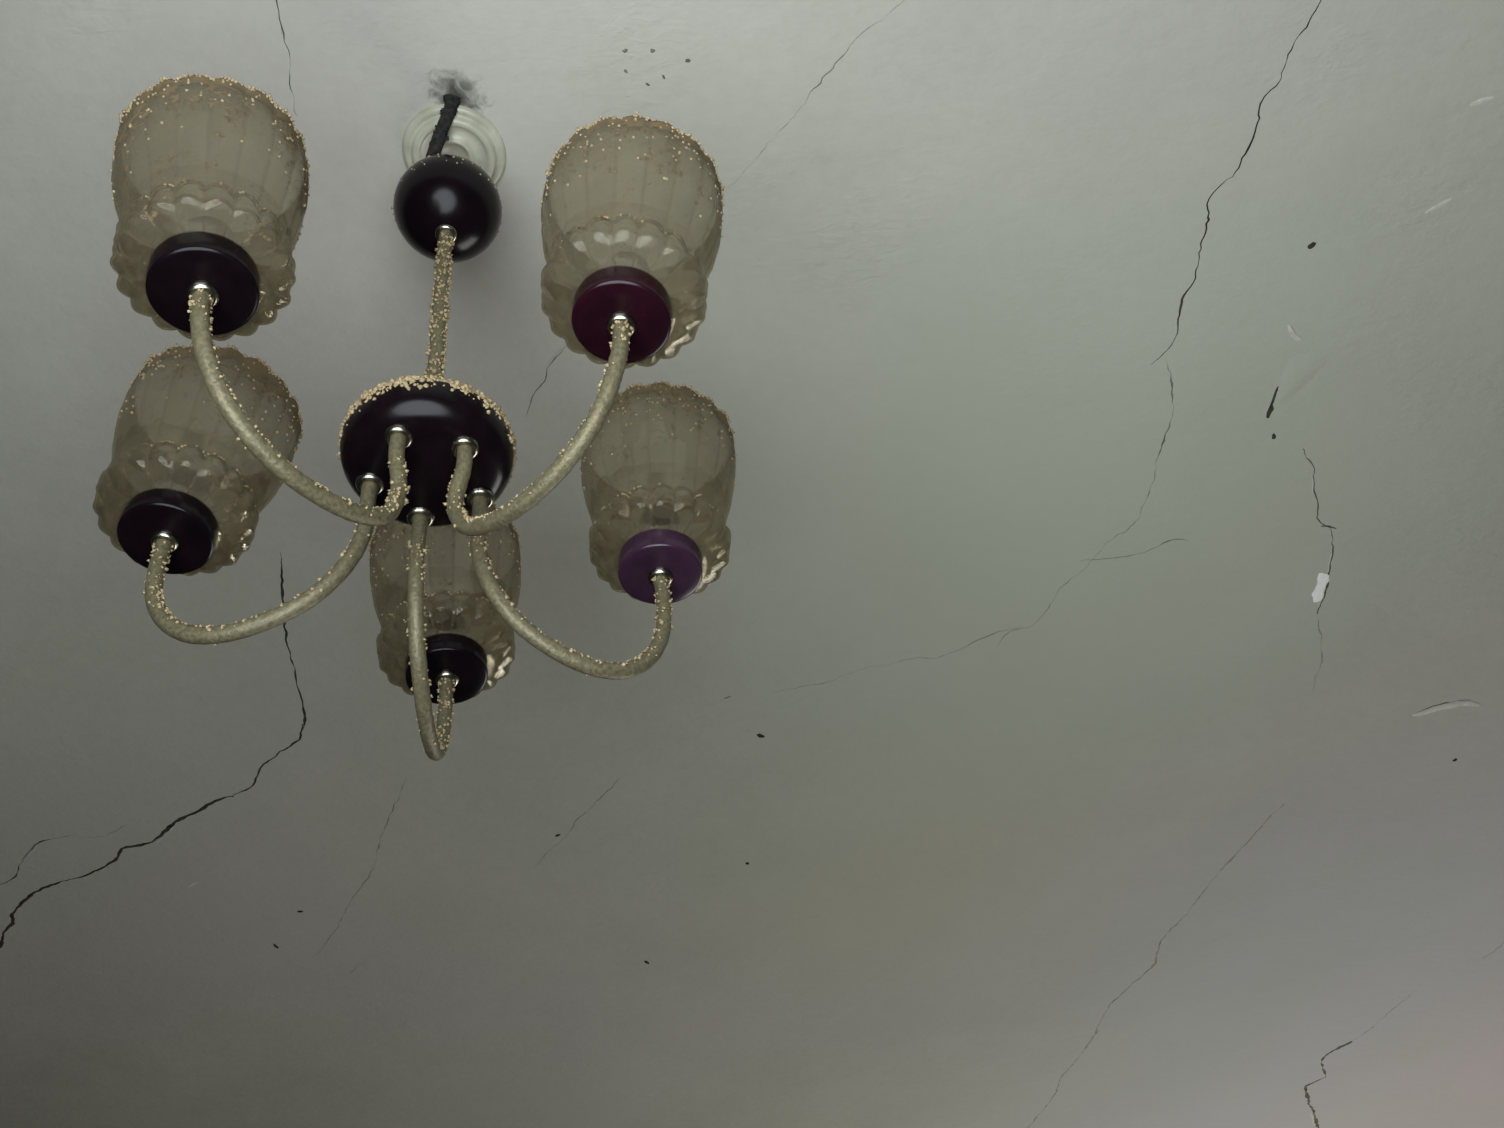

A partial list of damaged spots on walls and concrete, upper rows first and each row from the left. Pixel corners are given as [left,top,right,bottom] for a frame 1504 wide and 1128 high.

crack [276,0,297,116]
crack [649,0,904,263]
crack [527,331,574,413]
crack [769,0,1321,693]
crack [1303,449,1336,689]
spalling [1312,573,1330,602]
crack [0,553,307,948]
crack [1028,804,1284,1128]
crack [1304,994,1411,1128]